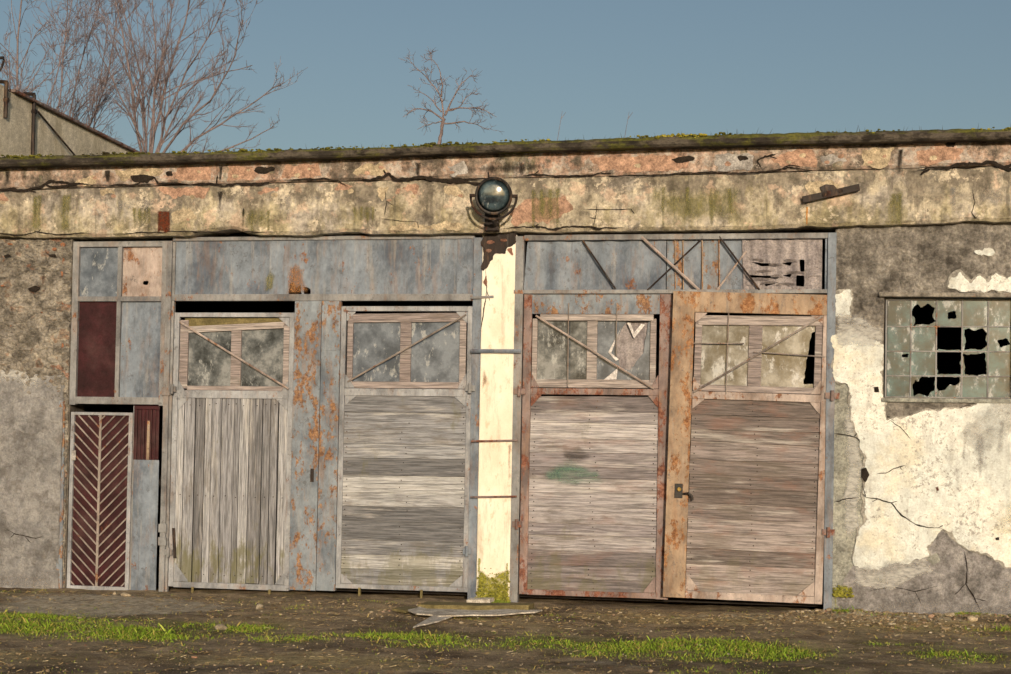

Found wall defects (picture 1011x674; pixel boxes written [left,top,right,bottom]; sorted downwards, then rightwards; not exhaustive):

crack [0,170,480,228]
crack [912,160,1011,175]
peeling [481,195,573,286]
rust [289,265,304,292]
spalling [835,222,1011,344]
spalling [0,238,74,588]
crack [835,465,943,529]
spalling [832,383,1011,615]
crack [871,555,988,613]